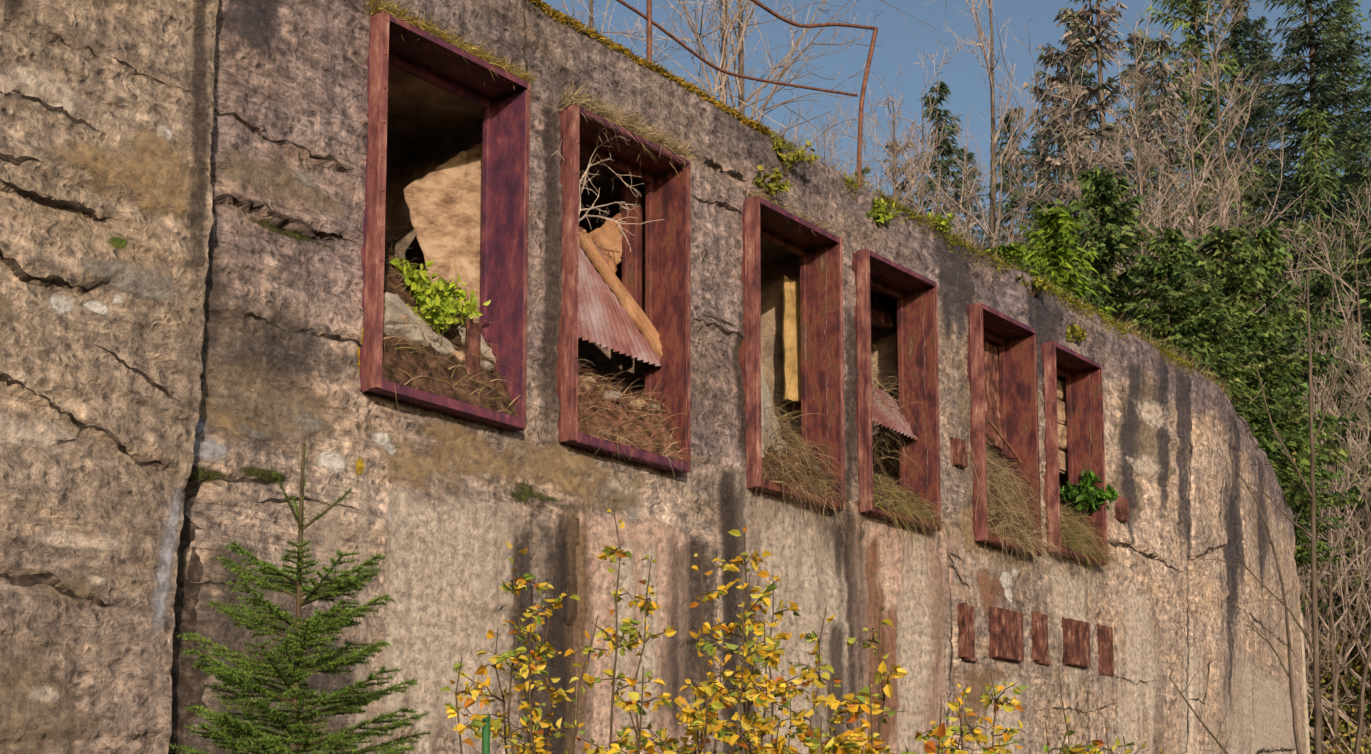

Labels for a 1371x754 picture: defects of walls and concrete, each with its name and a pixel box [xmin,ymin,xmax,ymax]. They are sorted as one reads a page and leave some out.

crack [0,249,110,292]
crack [92,343,181,402]
leakage [153,106,975,754]
leakage [1121,364,1140,537]
leakage [1157,358,1192,543]
crack [0,372,367,754]
corrosion [866,540,898,754]
crack [944,545,981,751]
leakage [986,674,1030,754]
leakage [1049,563,1096,644]
crack [1030,415,1296,754]
leakage [1105,417,1297,754]